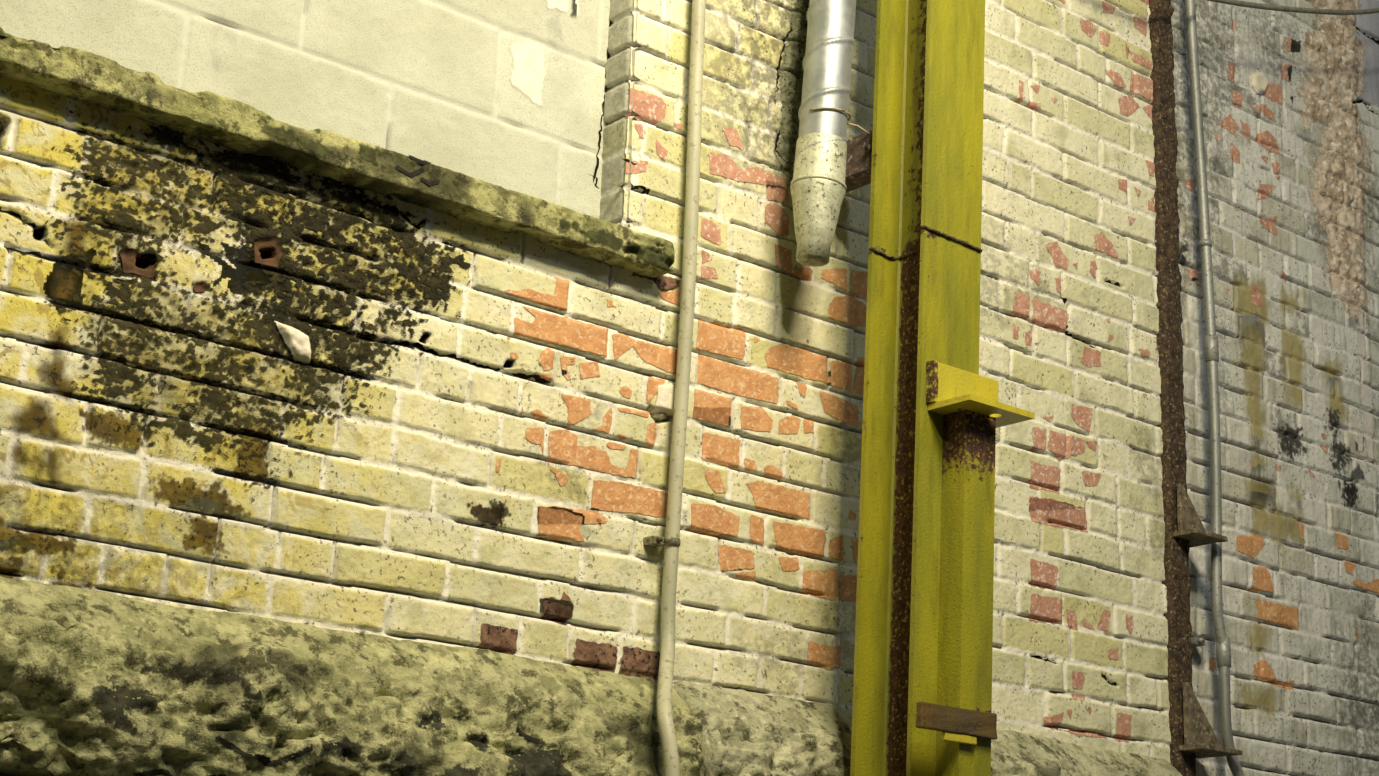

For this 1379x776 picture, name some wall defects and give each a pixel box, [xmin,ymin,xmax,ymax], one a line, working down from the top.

peeling [546,0,579,16]
peeling [510,41,547,106]
crack [775,28,793,168]
water stain [14,111,476,563]
water stain [1233,280,1303,542]
water stain [1322,363,1344,420]
water stain [0,517,96,589]
water stain [1245,689,1274,713]